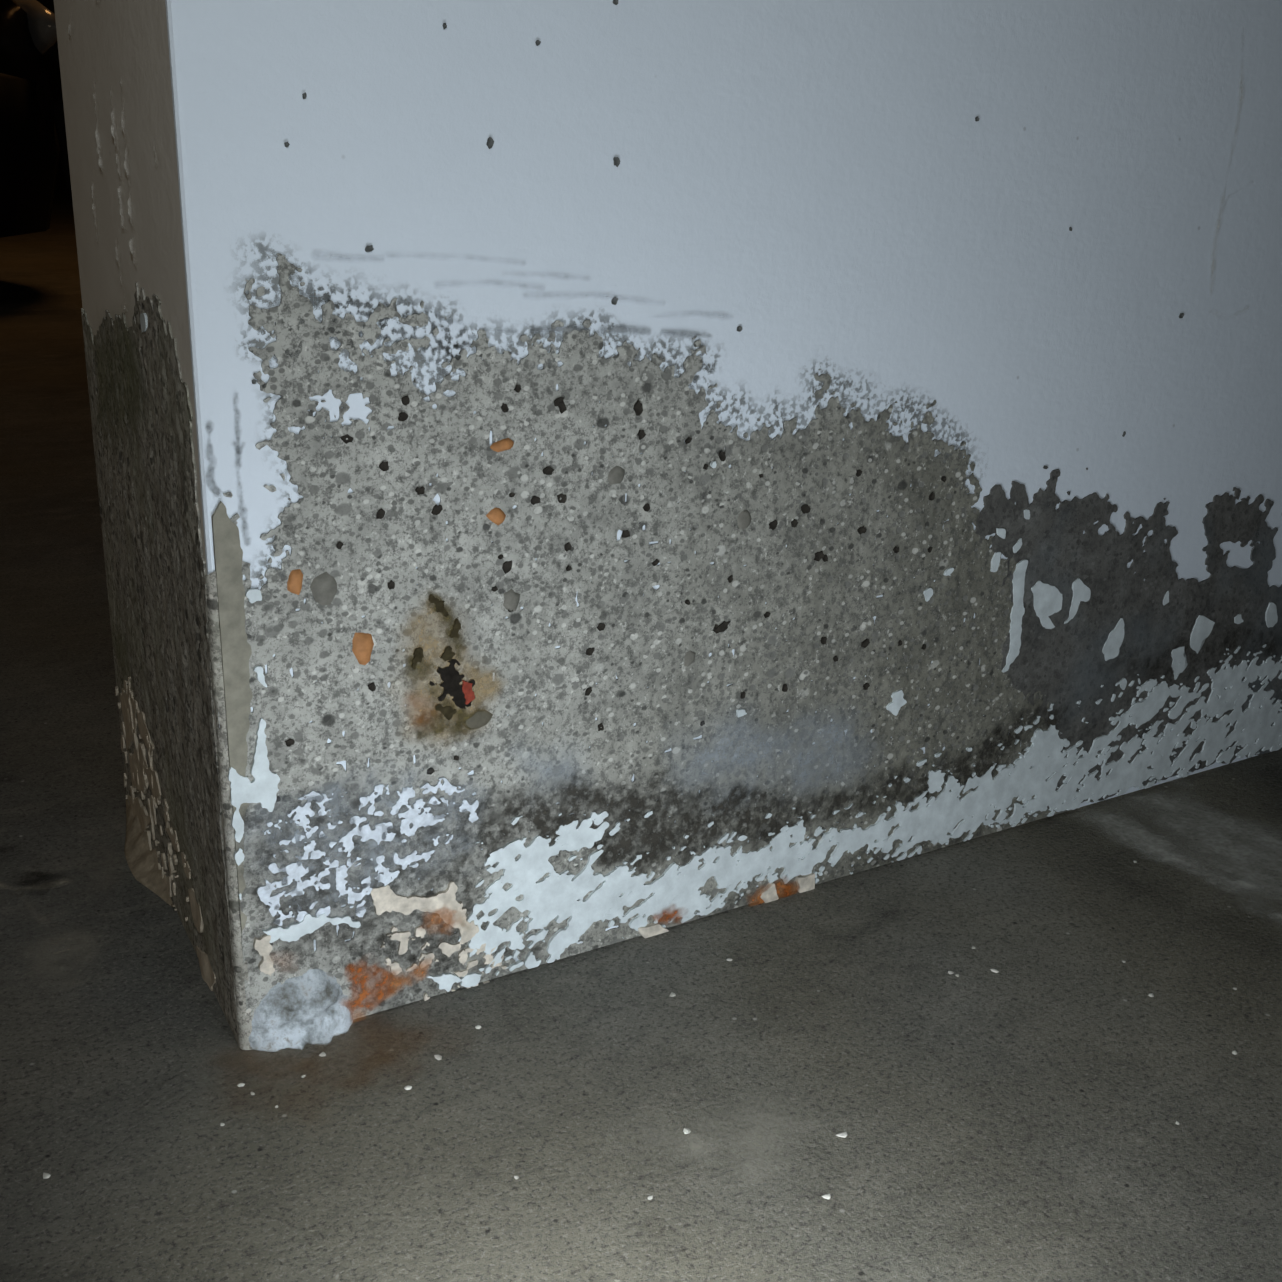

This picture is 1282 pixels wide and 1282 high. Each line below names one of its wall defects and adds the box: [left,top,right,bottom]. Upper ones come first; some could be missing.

rust [345,966,427,1009]
spalling [81,243,1282,1050]